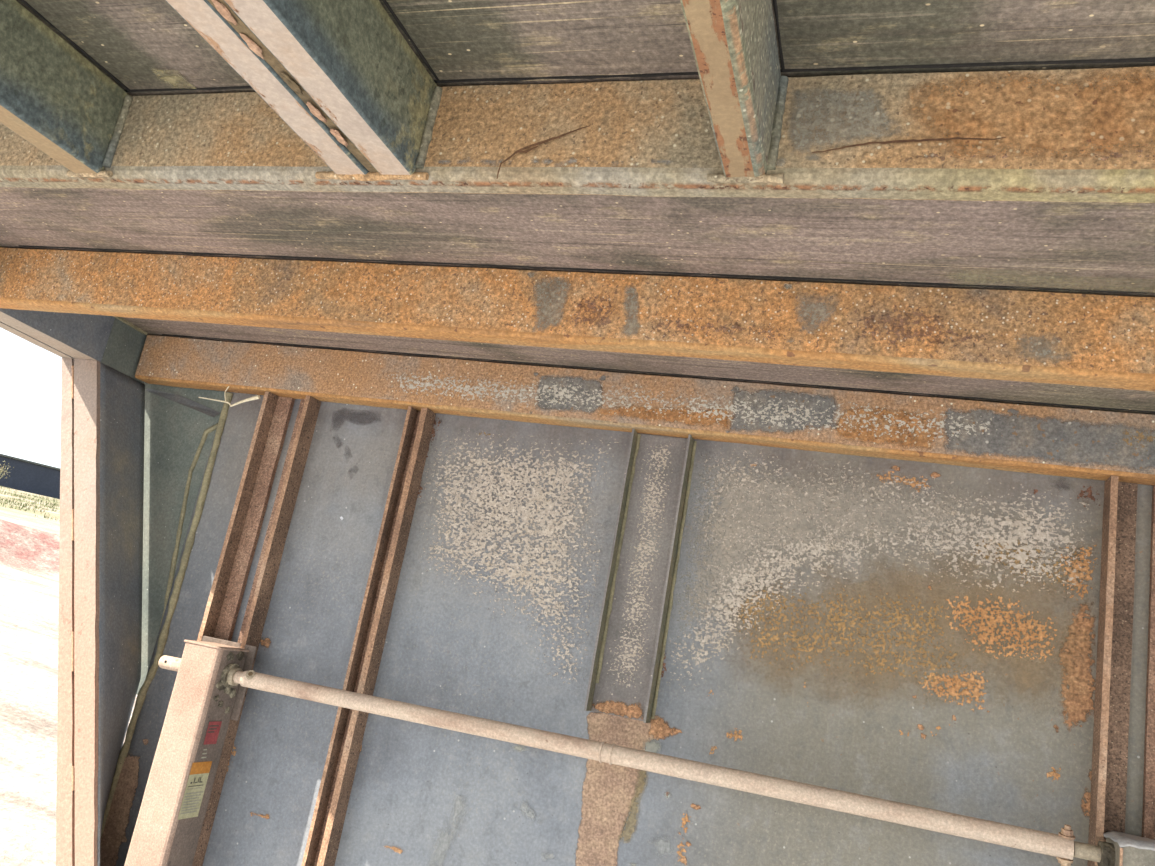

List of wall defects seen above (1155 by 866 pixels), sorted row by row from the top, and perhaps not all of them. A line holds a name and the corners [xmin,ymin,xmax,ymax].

rust [909,73,1155,157]
water stain [333,411,375,425]
rust [598,405,728,428]
rust [836,408,937,448]
water stain [419,431,621,684]
water stain [665,448,1097,692]
rust [729,536,1098,739]